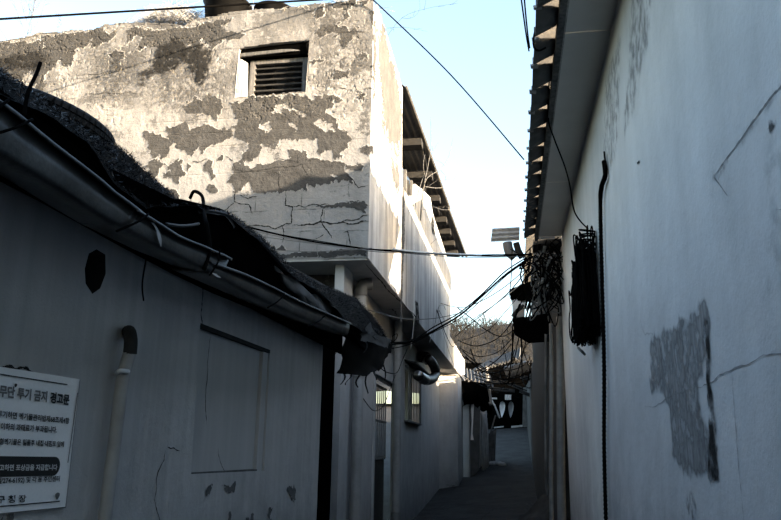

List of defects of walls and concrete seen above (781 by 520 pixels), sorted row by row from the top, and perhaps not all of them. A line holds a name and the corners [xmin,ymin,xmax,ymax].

peeling [0,16,246,91]
peeling [143,92,375,199]
crack [193,155,369,243]
peeling [312,199,370,215]
peeling [313,0,402,194]
crack [714,85,781,195]
crack [367,266,416,317]
crack [654,353,781,518]